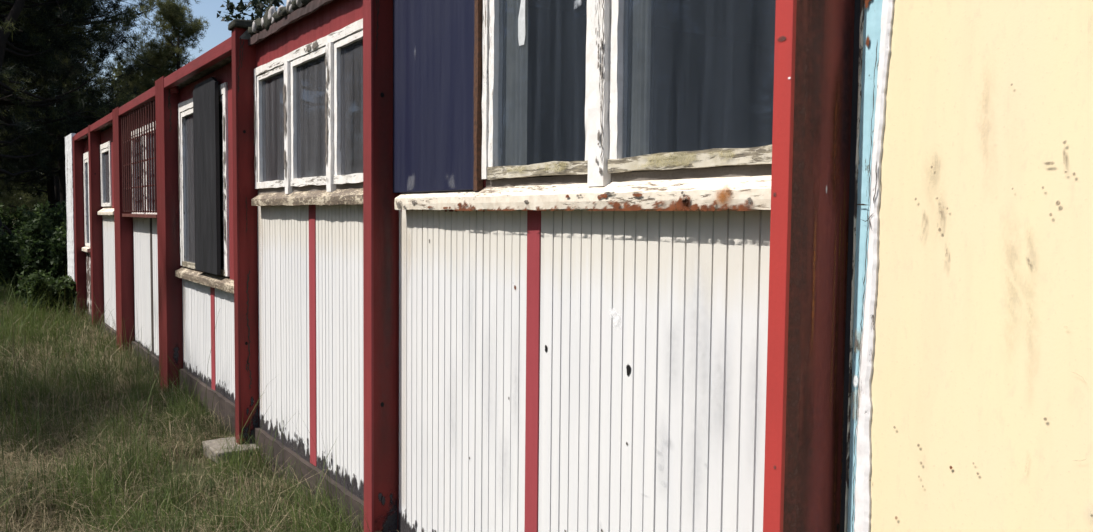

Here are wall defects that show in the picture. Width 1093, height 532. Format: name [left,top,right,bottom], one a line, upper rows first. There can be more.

corrosion [783,0,824,532]
corrosion [832,82,849,532]